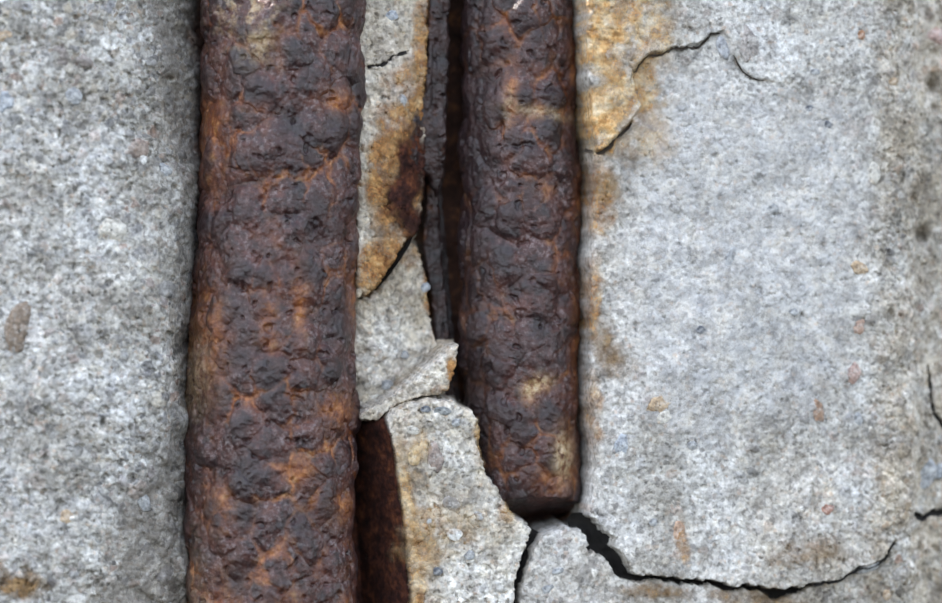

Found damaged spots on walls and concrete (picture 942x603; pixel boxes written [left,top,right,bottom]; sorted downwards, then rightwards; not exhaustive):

rust [358,0,429,296]
spalling [631,33,719,79]
spalling [108,0,367,603]
rust [447,358,457,382]
spalling [457,0,632,518]
spalling [636,78,846,433]
rust [352,416,435,603]
crack [513,527,539,603]
crack [567,512,896,599]